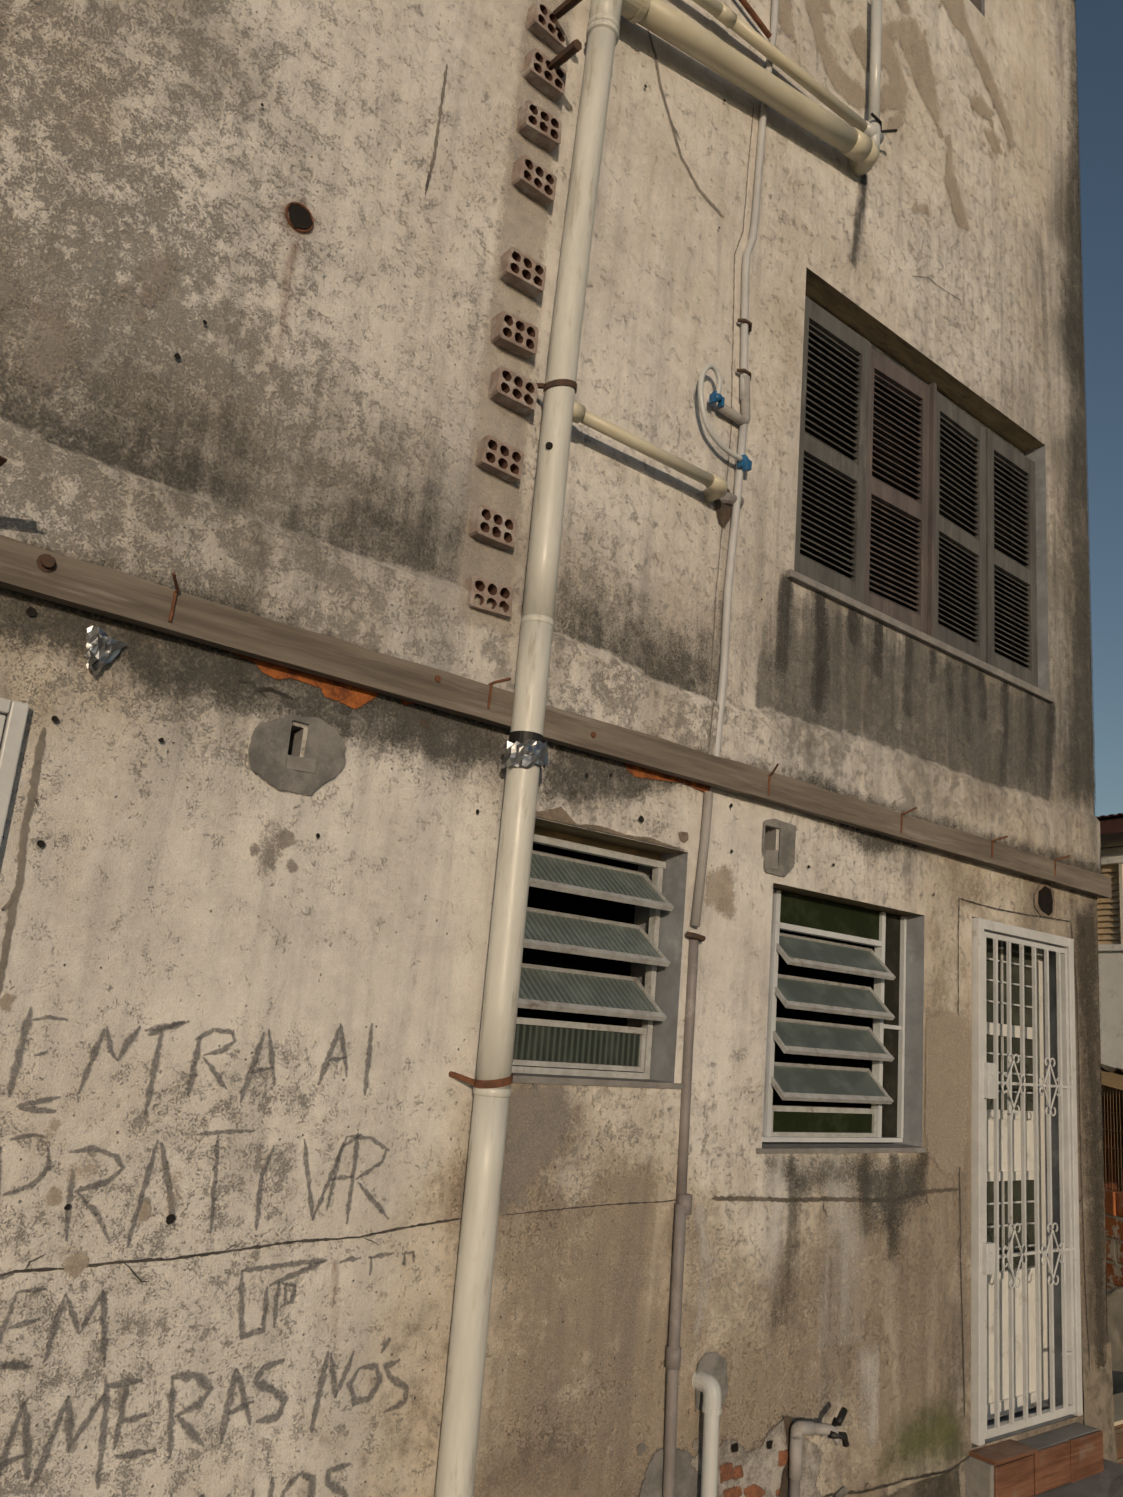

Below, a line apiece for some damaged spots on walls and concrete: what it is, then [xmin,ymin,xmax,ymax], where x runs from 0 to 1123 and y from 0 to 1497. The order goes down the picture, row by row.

damp [0,369,247,506]
damp [756,0,1096,806]
damp [281,479,466,581]
damp [0,583,507,770]
flaking render [222,649,379,709]
crack [2,1218,462,1282]
damp [766,1153,929,1320]
flaking render [690,1417,821,1497]
damp [885,1466,961,1497]